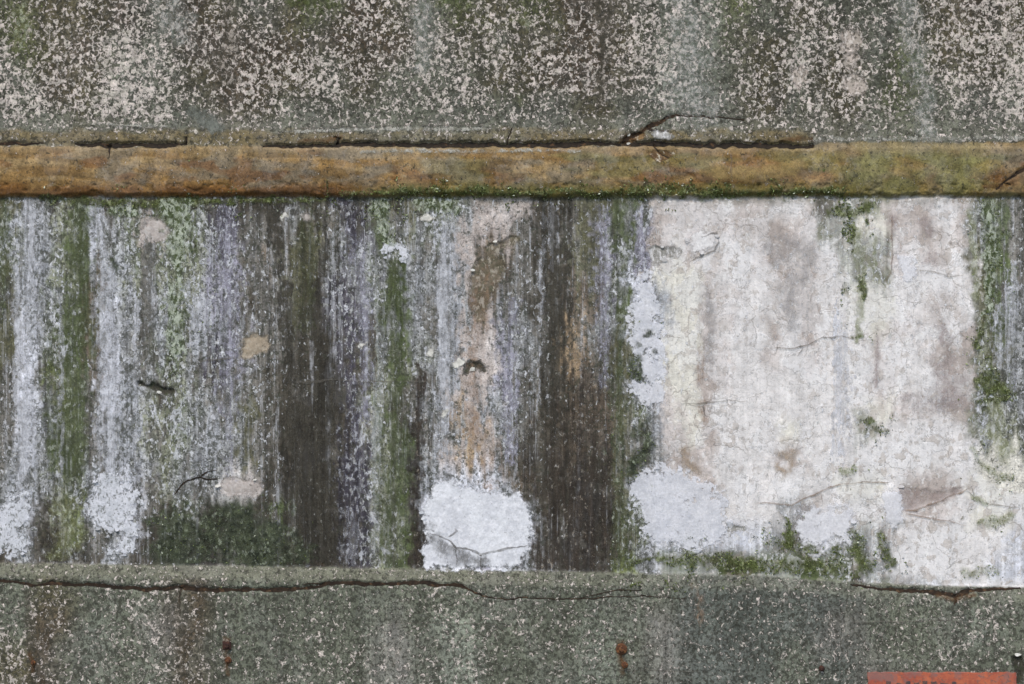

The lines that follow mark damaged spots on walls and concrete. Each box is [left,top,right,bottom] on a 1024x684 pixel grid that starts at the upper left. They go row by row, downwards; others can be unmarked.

crack [75,125,188,158]
crack [263,114,814,176]
water stain [12,197,240,495]
spalling [138,380,175,396]
water stain [260,198,400,566]
water stain [408,222,489,566]
spalling [452,358,485,374]
water stain [505,199,612,570]
peeling [419,479,535,573]
peeling [629,462,746,553]
crack [0,541,685,609]
crack [850,584,1021,622]